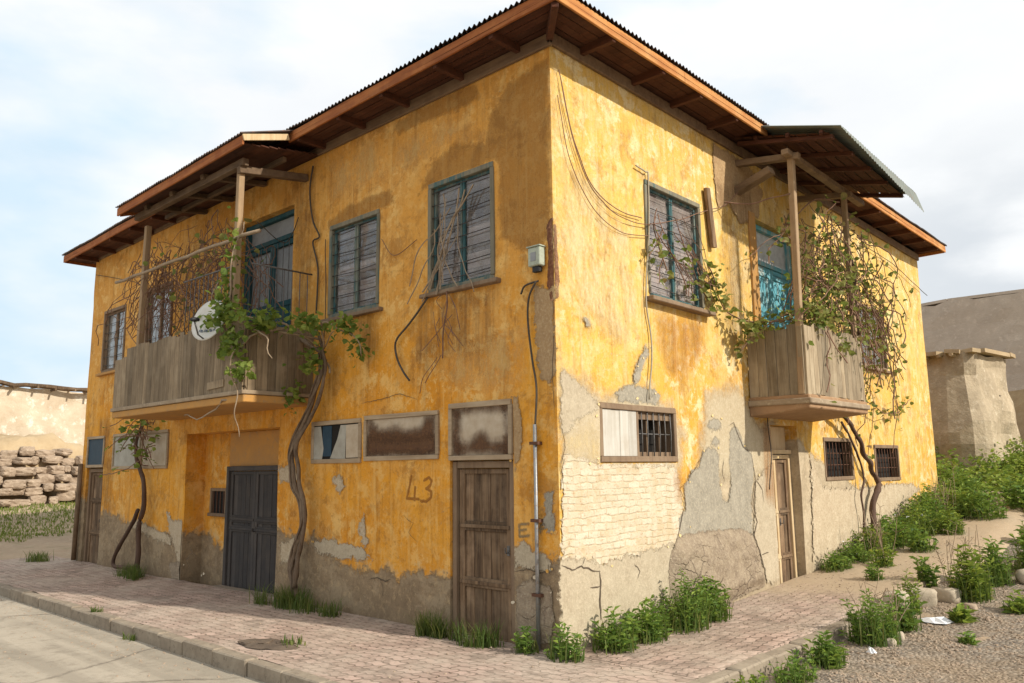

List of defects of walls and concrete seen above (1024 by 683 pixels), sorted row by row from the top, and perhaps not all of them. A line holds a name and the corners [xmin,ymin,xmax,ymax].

spalling [509,218,779,644]
peeling [133,512,184,580]
peeling [279,512,373,564]
peeling [332,474,346,495]
peeling [810,454,919,561]
crack [514,559,602,617]